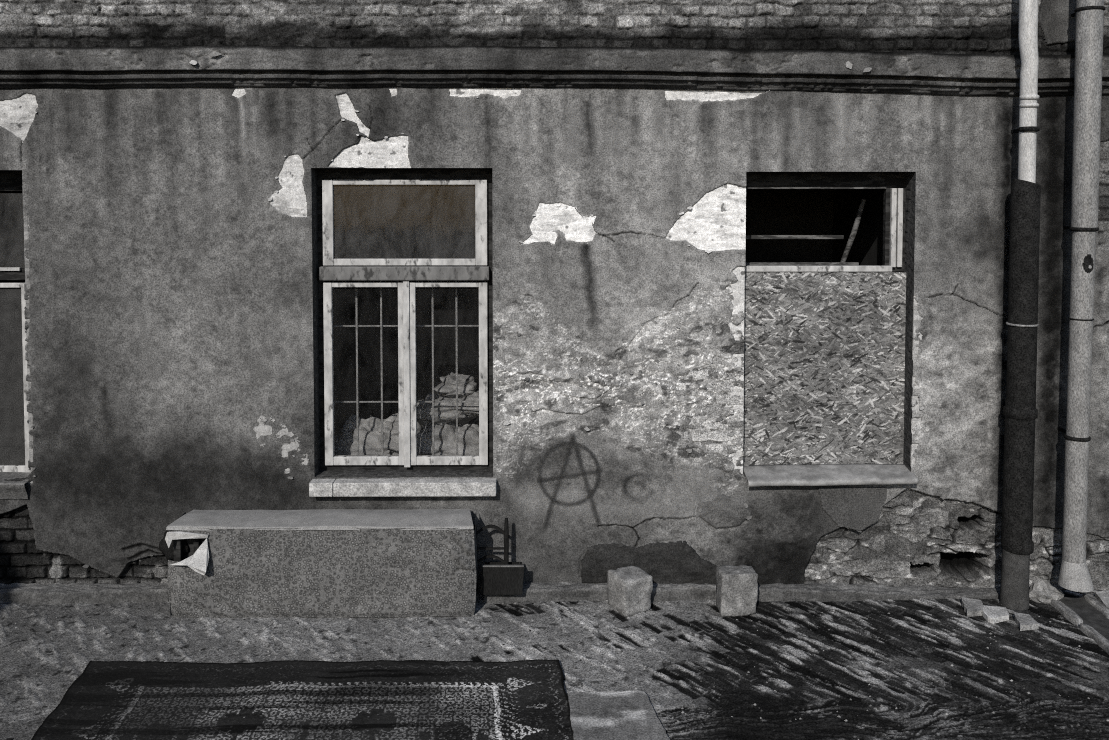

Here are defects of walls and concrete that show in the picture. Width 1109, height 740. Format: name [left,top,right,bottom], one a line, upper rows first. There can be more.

flaking render [0,93,38,143]
flaking render [328,93,411,168]
flaking render [268,154,307,217]
flaking render [518,202,598,245]
flaking render [666,184,746,253]
flaking render [1098,139,1109,251]
peeling [493,266,746,495]
flaking render [0,505,168,585]
crack [598,516,694,546]
flaking render [804,488,1002,588]
flaking render [1029,524,1068,590]
flaking render [1086,533,1109,590]